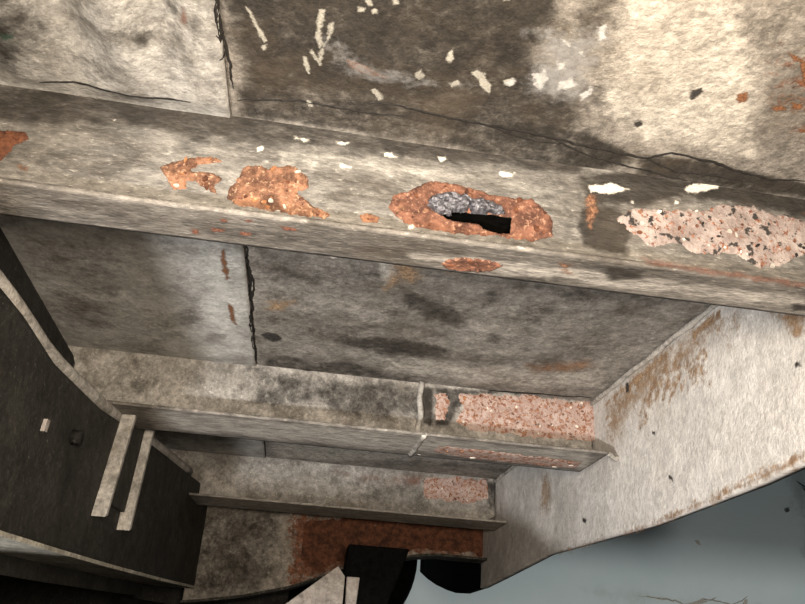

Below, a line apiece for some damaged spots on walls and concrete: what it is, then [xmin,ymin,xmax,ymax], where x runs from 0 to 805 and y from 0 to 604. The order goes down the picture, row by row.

crack [39,81,190,103]
crack [213,0,805,182]
corrosion [160,156,222,194]
corrosion [227,165,330,219]
peeling [427,191,505,217]
corrosion [587,196,598,228]
corrosion [221,250,229,279]
corrosion [441,257,503,273]
crack [246,246,257,362]
corrosion [611,313,714,435]
crack [638,595,747,604]